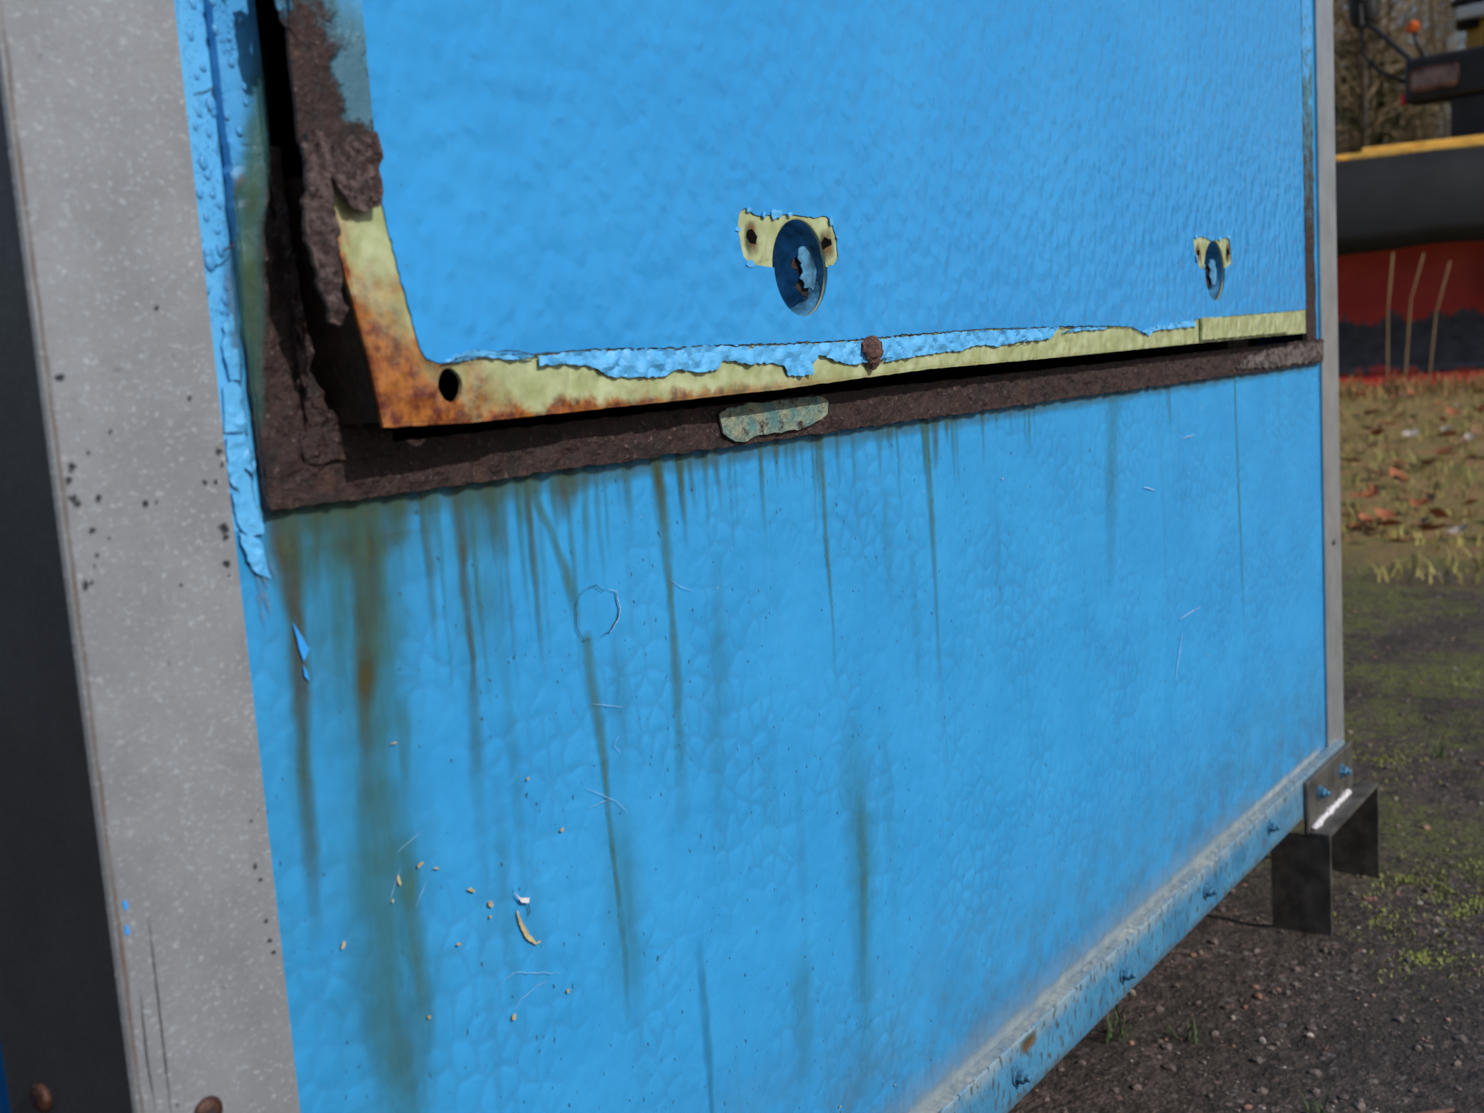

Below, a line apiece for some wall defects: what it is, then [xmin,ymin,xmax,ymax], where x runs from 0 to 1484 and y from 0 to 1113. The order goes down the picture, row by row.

peeling [275,0,306,29]
peeling [331,181,1293,423]
peeling [221,312,271,578]
rust [270,503,320,790]
peeling [293,623,310,681]
rust [340,492,405,713]
rust [453,485,466,593]